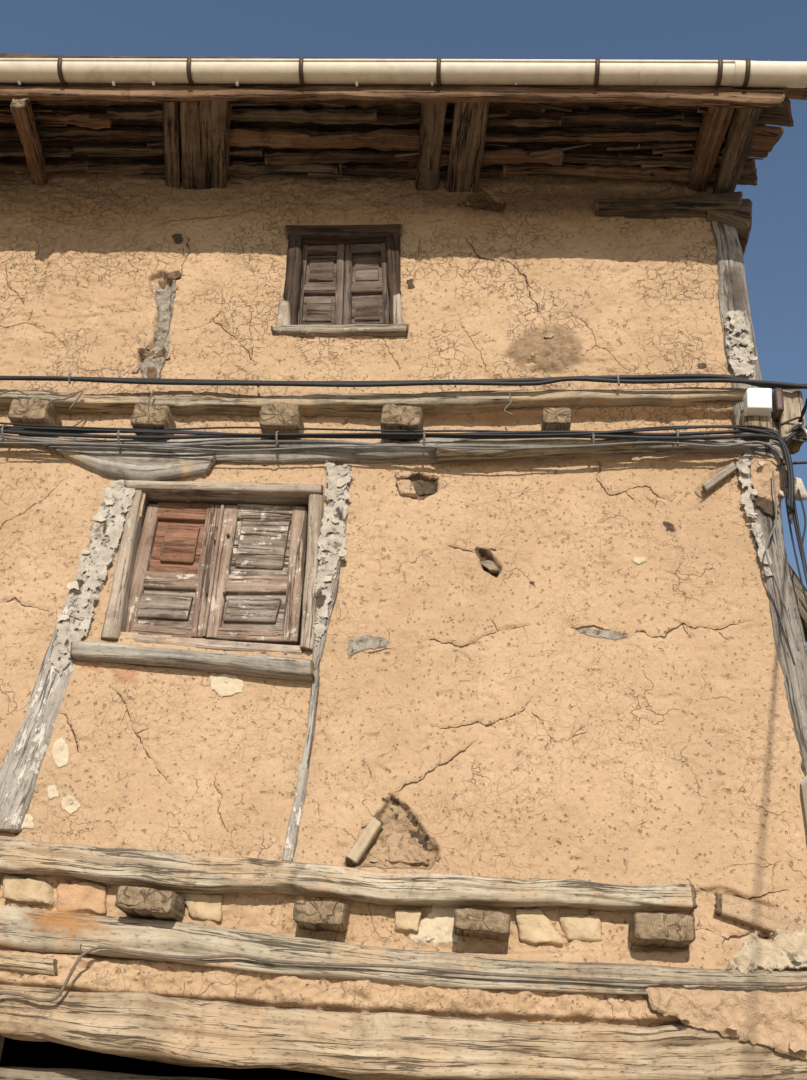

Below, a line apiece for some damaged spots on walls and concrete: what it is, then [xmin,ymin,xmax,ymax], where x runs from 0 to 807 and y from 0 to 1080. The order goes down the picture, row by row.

crack [466,238,547,329]
spalling [132,270,181,378]
crack [572,315,630,370]
spalling [394,472,439,500]
spalling [475,546,501,577]
crack [430,617,527,648]
crack [630,621,745,640]
crack [394,697,586,797]
spalling [345,796,441,869]
peeling [724,926,807,976]
peeling [645,981,807,1059]